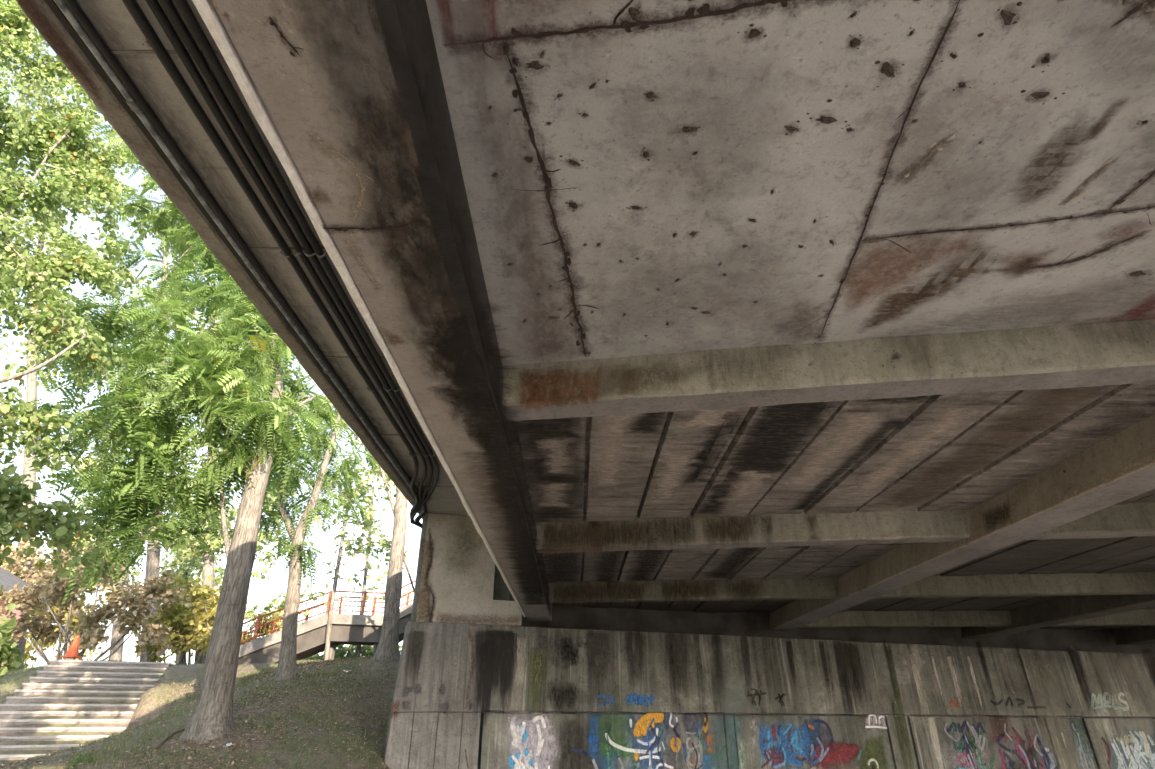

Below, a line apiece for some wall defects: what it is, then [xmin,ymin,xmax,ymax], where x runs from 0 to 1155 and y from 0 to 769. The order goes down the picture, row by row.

crack [446,0,826,359]
crack [802,0,1155,344]
leakage [309,0,776,605]
corrosion [521,369,601,407]
leakage [791,413,881,484]
leakage [832,408,970,498]
leakage [406,631,424,679]
leakage [438,615,526,715]
leakage [550,683,577,710]
leakage [787,642,795,678]
leakage [819,641,866,709]
leakage [558,723,607,769]